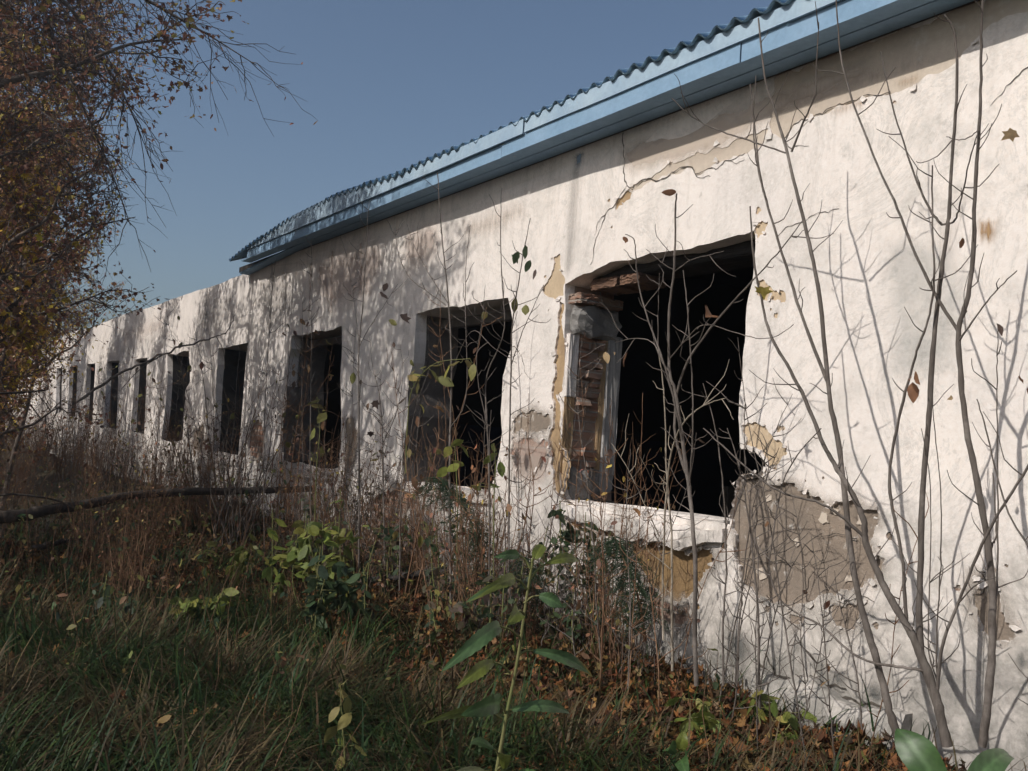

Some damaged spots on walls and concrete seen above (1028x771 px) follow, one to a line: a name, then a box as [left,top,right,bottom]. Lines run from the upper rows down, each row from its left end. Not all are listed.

crack [590,134,745,265]
peeling [608,0,1028,208]
peeling [510,255,571,496]
peeling [628,422,893,633]
peeling [954,564,1021,648]